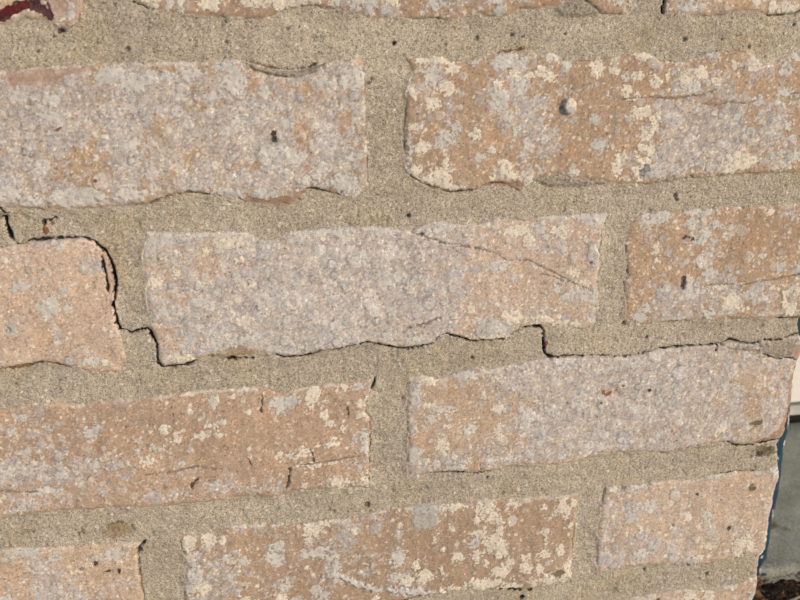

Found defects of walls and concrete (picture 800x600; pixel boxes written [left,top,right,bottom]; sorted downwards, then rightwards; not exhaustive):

crack [0,207,195,367]
crack [275,317,798,360]
crack [0,361,67,369]
peeling [81,421,101,444]
peeling [134,424,183,468]
peeling [193,385,350,491]
peeling [337,383,369,487]
leakage [751,444,777,457]
peeling [26,485,70,499]
peeling [0,547,65,568]